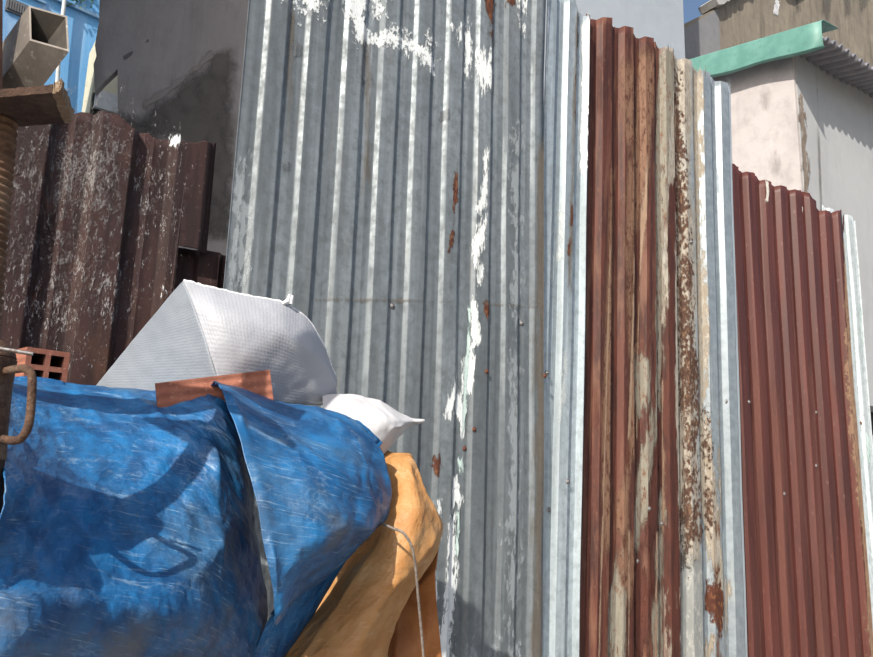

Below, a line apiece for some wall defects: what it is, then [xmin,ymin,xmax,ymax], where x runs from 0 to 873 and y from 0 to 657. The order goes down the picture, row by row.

corrosion [485,0,516,46]
corrosion [447,173,459,253]
corrosion [626,60,720,657]
corrosion [431,454,441,477]
corrosion [842,239,873,657]
corrosion [705,567,724,657]